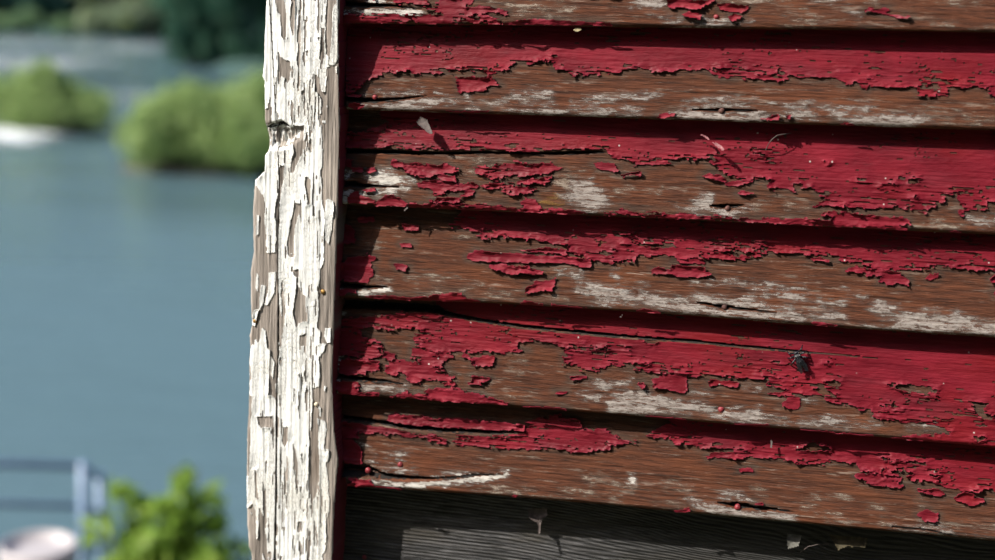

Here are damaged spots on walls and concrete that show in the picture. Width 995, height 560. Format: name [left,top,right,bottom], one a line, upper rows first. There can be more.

crack [342,463,505,480]
peeling [247,0,995,560]